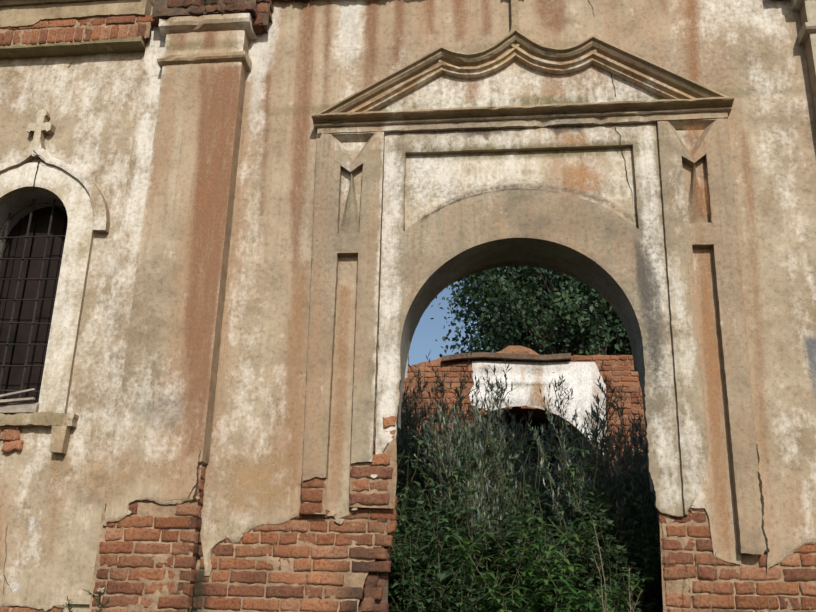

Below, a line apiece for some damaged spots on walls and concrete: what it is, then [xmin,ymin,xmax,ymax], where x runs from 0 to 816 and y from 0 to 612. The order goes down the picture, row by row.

spalling [0,0,313,47]
crack [615,127,633,204]
spalling [0,426,24,453]
spalling [89,416,398,612]
crack [756,444,770,552]
spalling [655,503,816,612]
spalling [0,603,66,612]